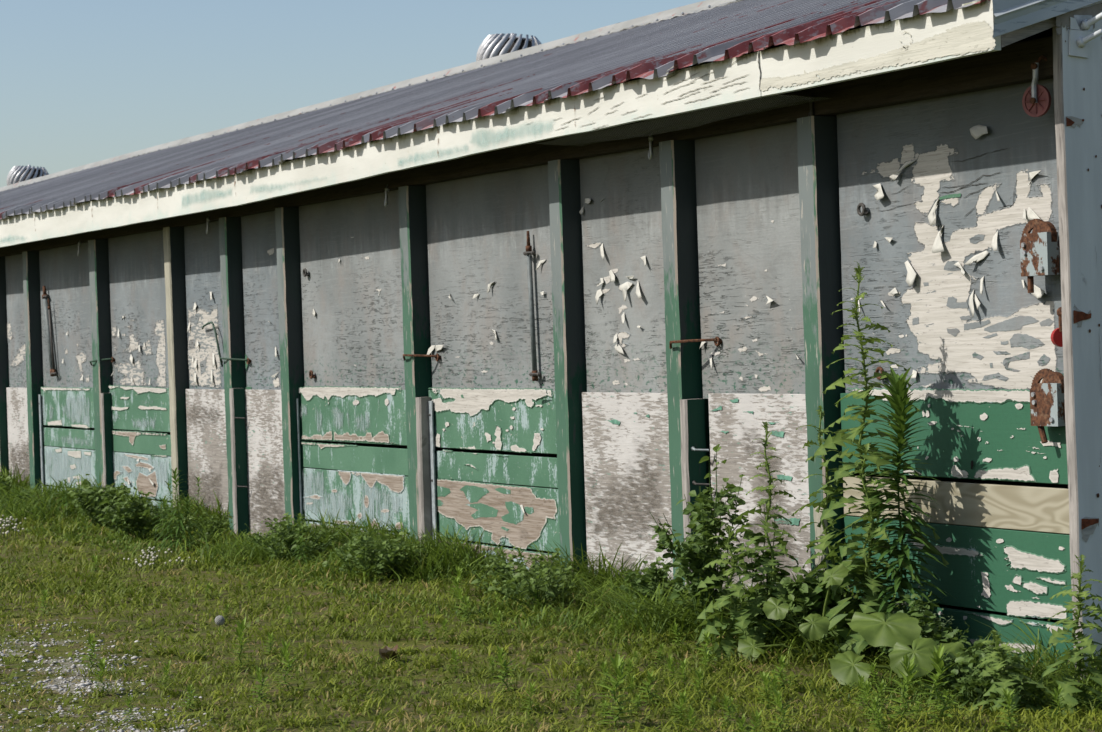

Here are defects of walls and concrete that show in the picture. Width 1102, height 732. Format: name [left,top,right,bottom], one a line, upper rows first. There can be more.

peeling [187,292,222,389]
peeling [595,269,642,362]
peeling [860,142,1061,483]
corrosion [1073,304,1100,333]
peeling [299,386,401,450]
peeling [847,387,892,402]
peeling [302,470,404,542]
peeling [428,387,558,570]
peeling [907,537,984,558]
corrosion [1081,517,1099,542]
peeling [963,539,1067,634]
peeling [968,638,1039,654]